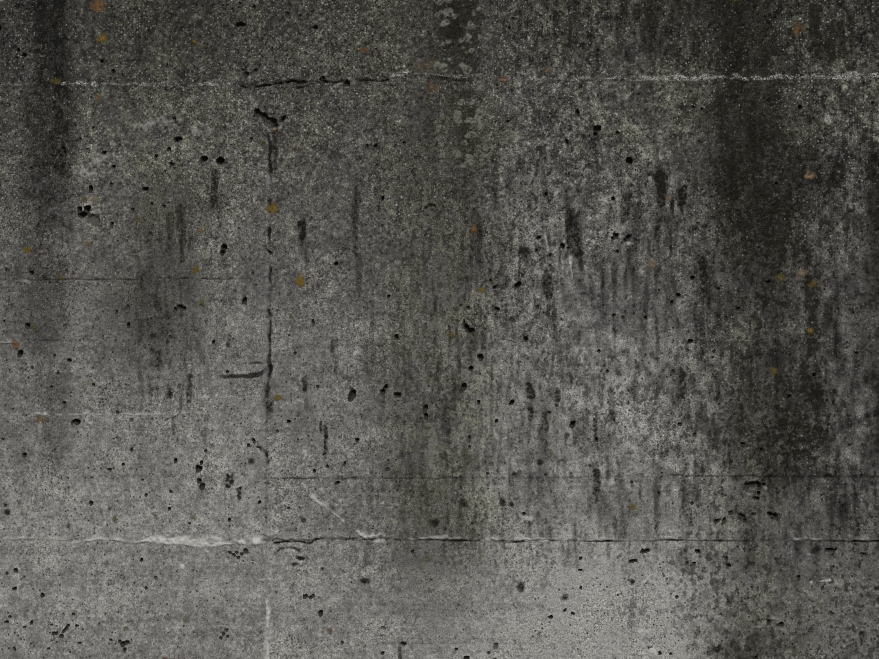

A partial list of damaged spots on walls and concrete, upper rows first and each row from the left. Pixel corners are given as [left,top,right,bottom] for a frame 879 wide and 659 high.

leakage [433,0,484,152]
crack [265,228,273,282]
leakage [566,208,584,280]
leakage [653,0,837,493]
leakage [542,269,554,299]
leakage [527,382,549,431]
leakage [592,460,609,496]
crack [442,537,557,545]